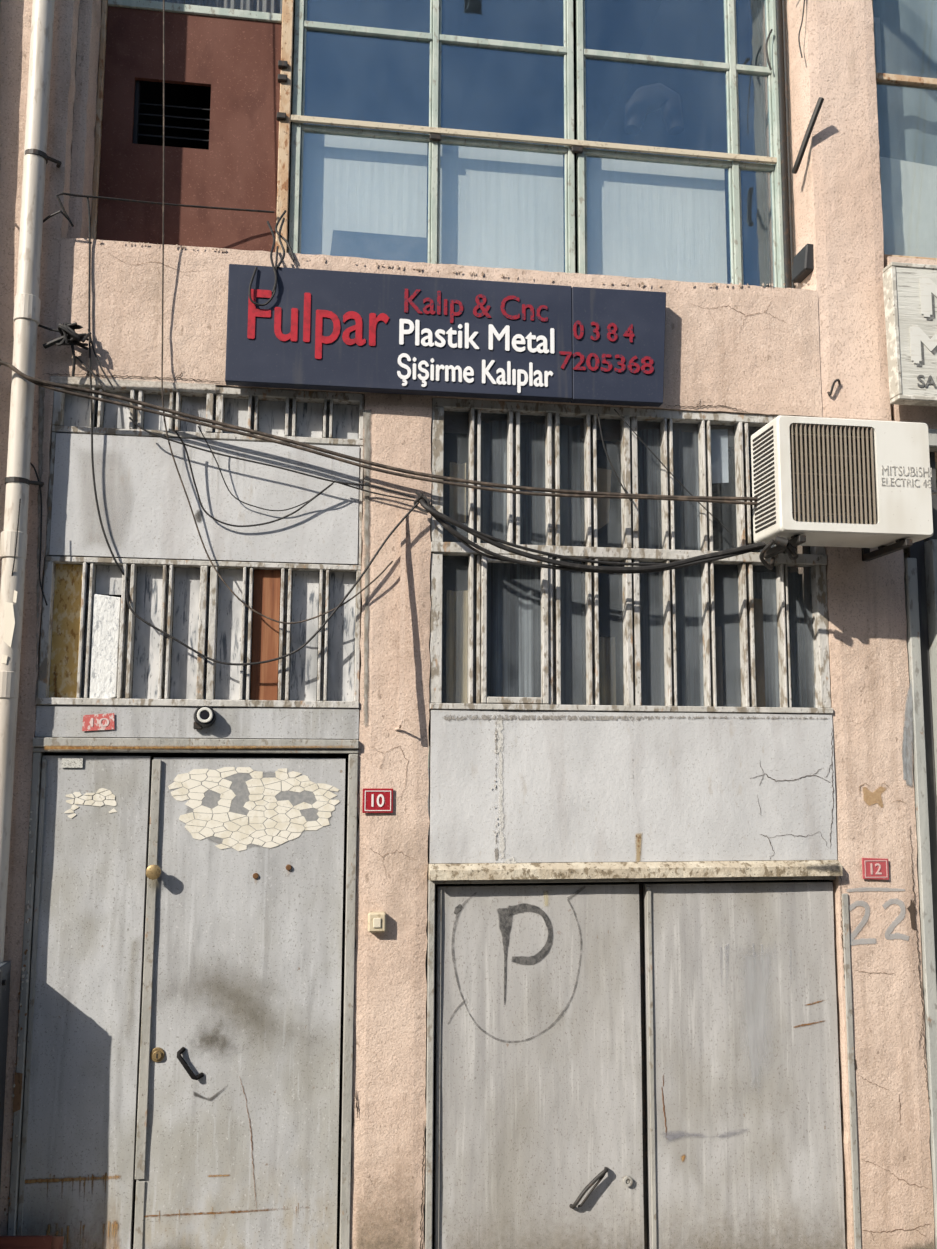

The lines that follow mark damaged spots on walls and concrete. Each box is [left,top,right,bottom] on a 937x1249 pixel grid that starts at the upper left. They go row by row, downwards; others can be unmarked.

crack [750,733,834,858]
crack [840,829,931,1121]
corrosion [25,1173,119,1192]
corrosion [144,1209,269,1217]